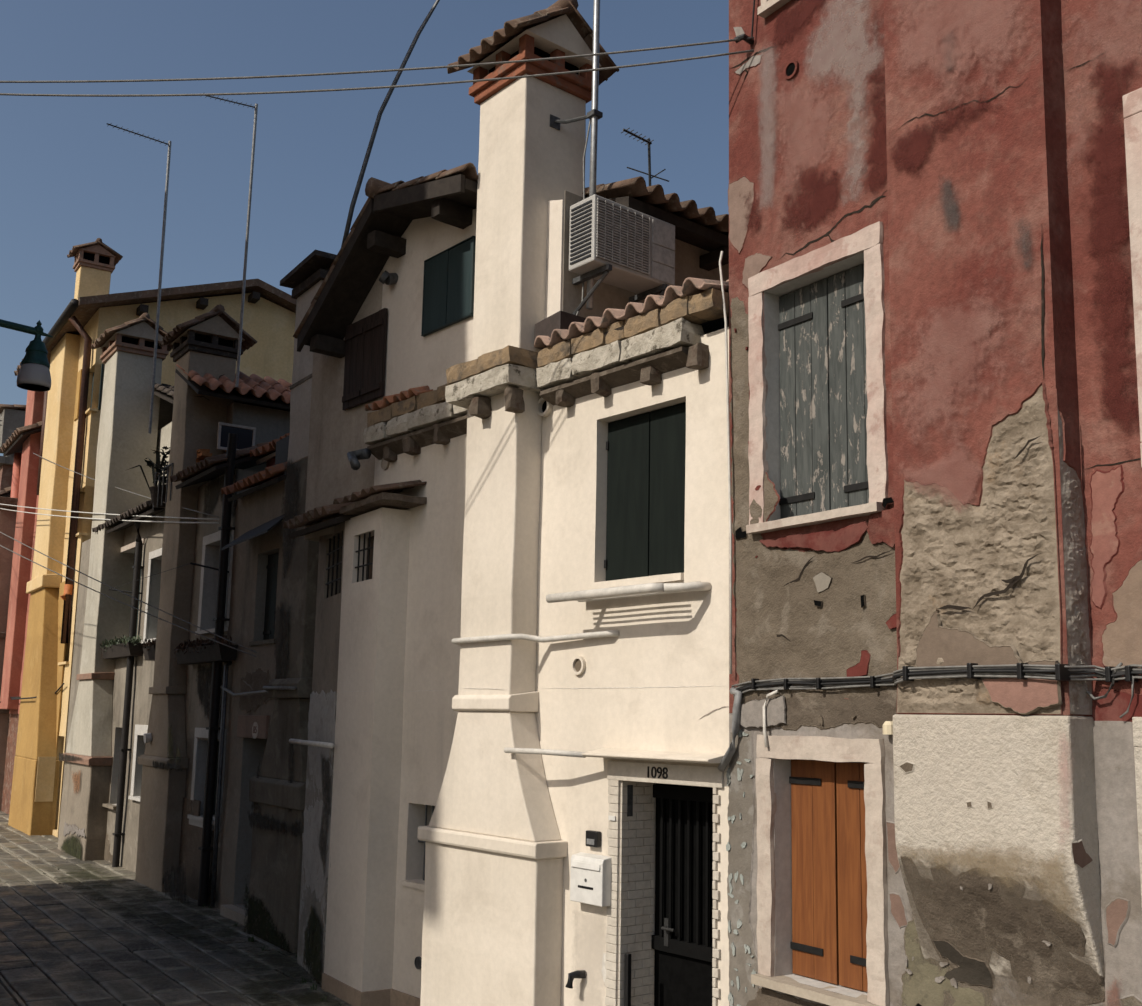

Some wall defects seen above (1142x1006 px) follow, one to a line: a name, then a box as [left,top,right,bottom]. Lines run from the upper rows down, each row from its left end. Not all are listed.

water stain [746,0,986,230]
crack [902,78,1028,126]
crack [781,190,887,258]
crack [1038,224,1046,381]
flaking render [726,175,1142,1006]
crack [938,553,1041,610]
water stain [319,758,330,873]